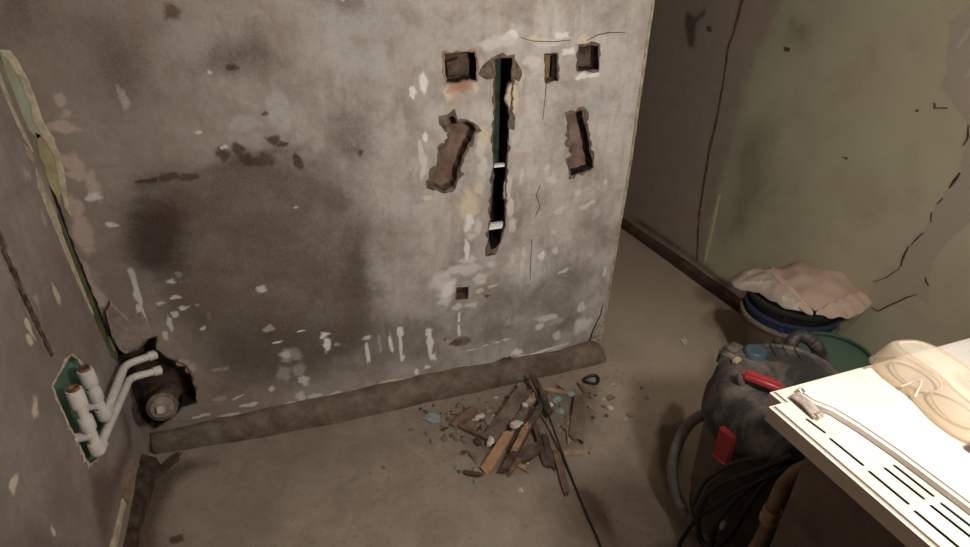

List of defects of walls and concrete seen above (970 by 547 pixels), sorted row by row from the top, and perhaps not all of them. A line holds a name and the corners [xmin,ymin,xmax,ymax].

crack [0,49,116,359]
flaking render [60,151,120,308]
flaking render [213,134,304,170]
water stain [100,85,627,406]
crack [696,0,744,262]
spalling [0,225,99,470]
flaking render [268,346,341,404]
flaking render [443,289,605,362]
flaking render [8,473,19,495]